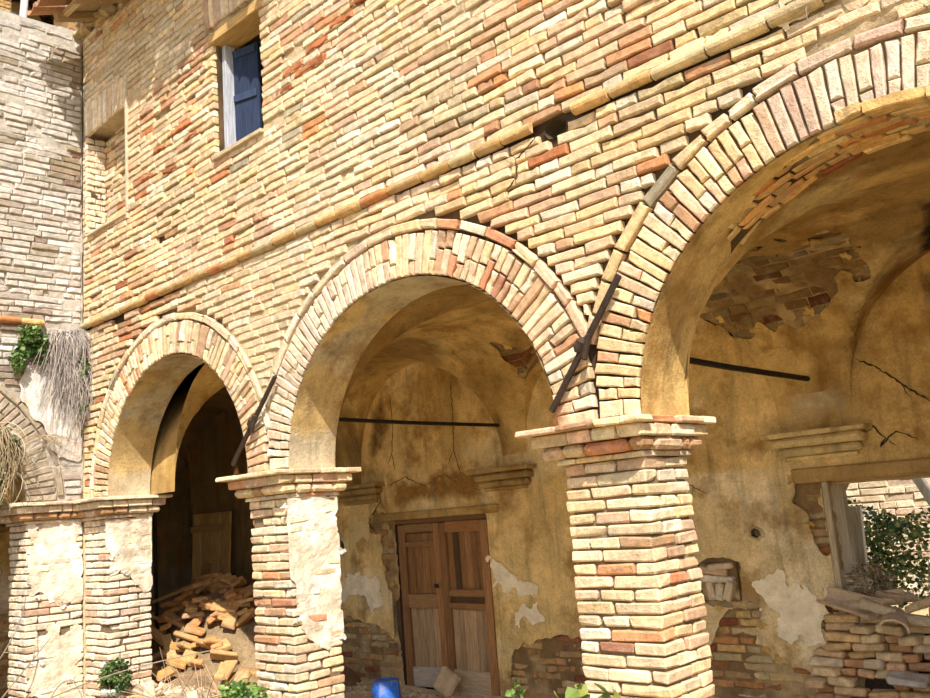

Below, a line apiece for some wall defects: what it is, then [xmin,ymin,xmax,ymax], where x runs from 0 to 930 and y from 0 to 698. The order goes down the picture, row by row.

flaking render [700,85,930,339]
crack [858,360,930,401]
crack [368,386,478,534]
crack [867,425,917,447]
flaking render [0,610,12,697]
peeling [25,623,83,698]
peeling [26,522,83,609]
peeling [105,516,153,593]
peeling [280,495,405,685]
flaking render [507,634,592,698]
flaking render [695,557,848,698]
flaking render [787,474,844,570]